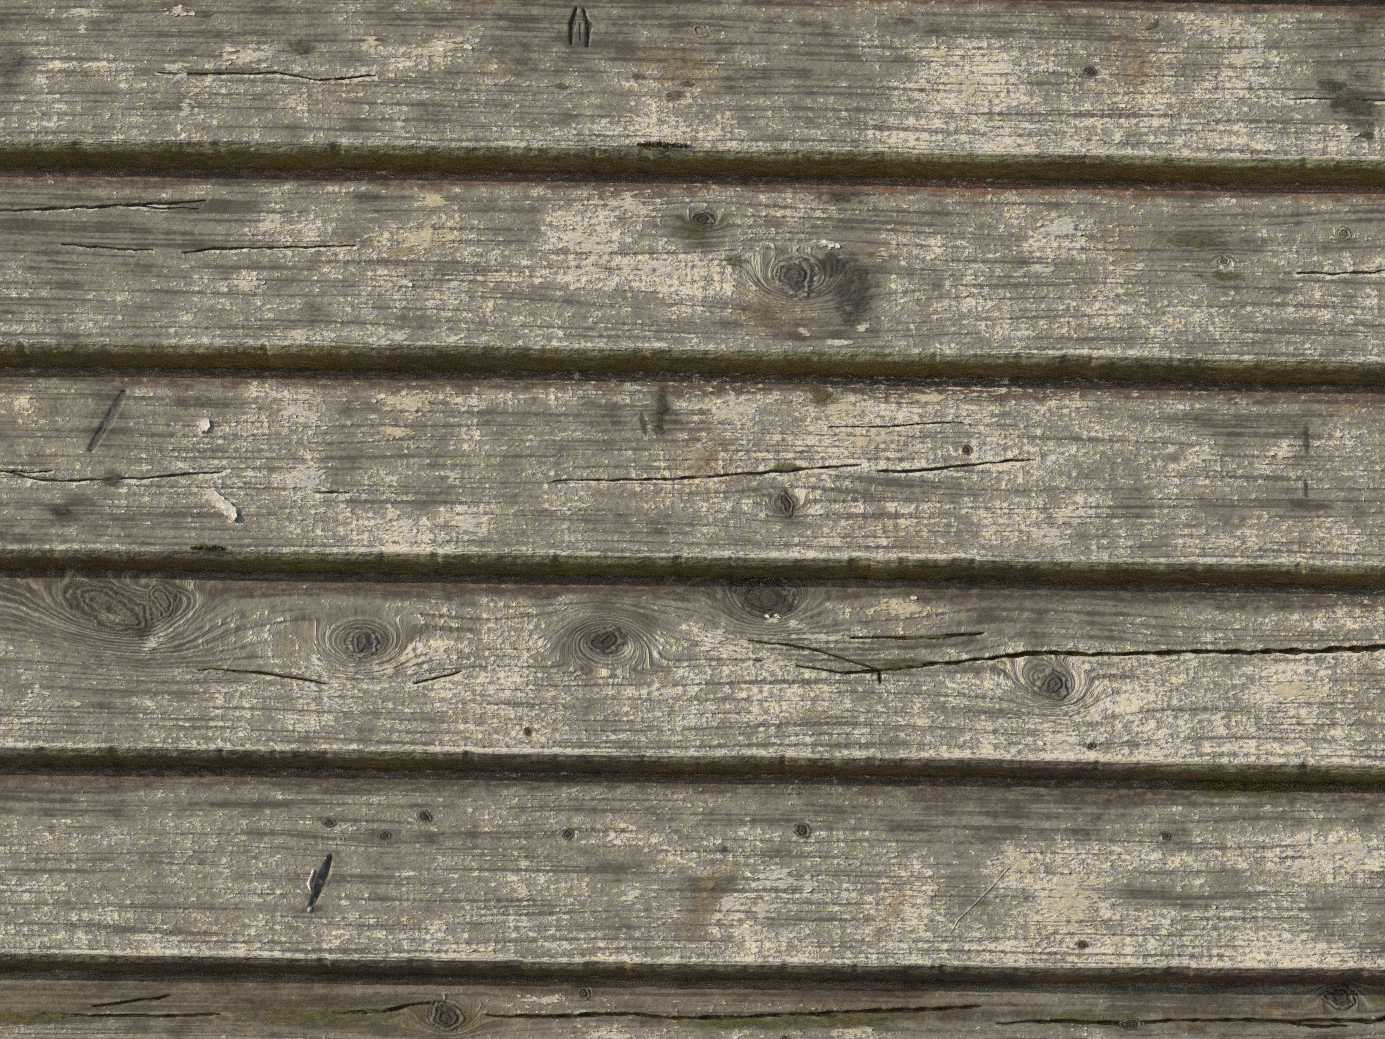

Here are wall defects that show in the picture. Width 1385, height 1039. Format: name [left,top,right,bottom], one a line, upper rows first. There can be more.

crack [158,71,376,81]
crack [0,200,206,211]
crack [62,243,356,253]
crack [829,420,964,428]
crack [0,470,223,482]
crack [551,459,1036,482]
crack [749,632,1385,684]
crack [40,995,220,1017]
crack [336,1001,445,1014]
crack [486,1005,1385,1028]